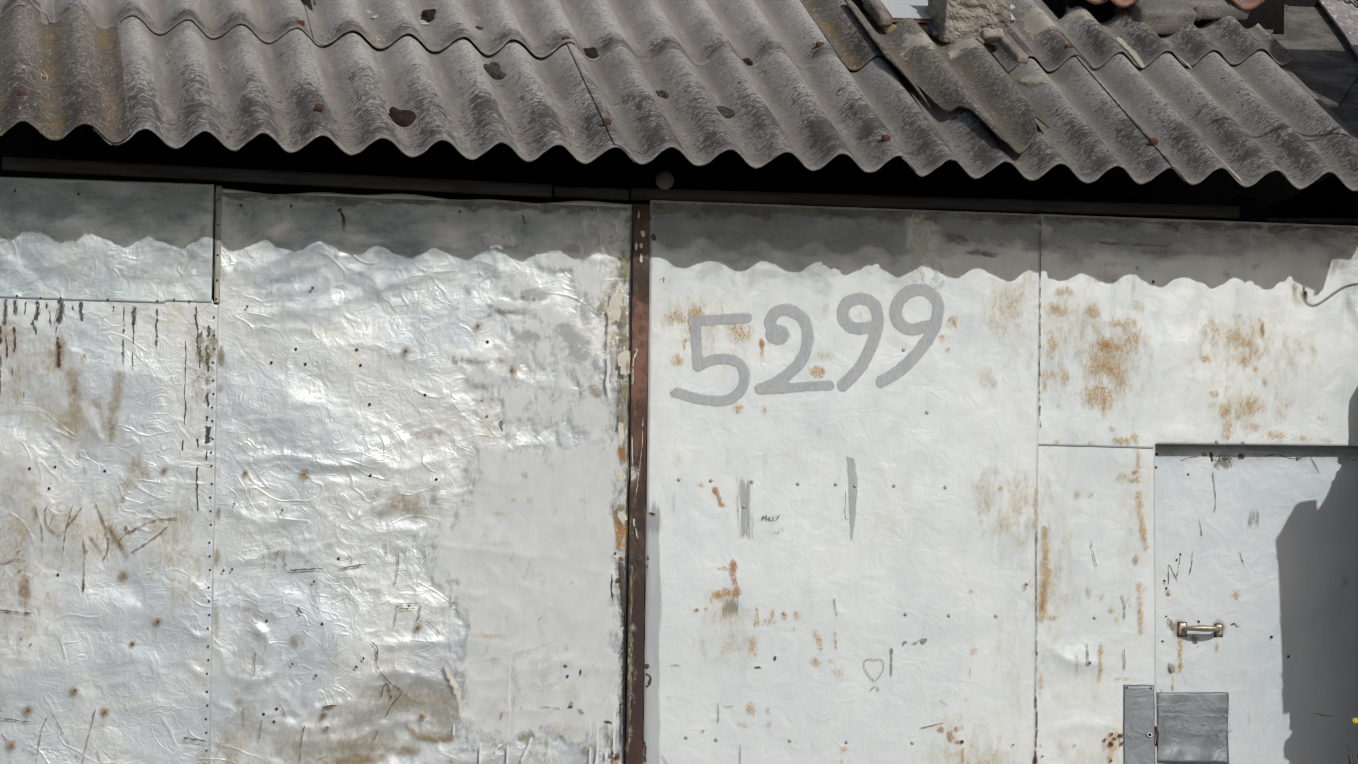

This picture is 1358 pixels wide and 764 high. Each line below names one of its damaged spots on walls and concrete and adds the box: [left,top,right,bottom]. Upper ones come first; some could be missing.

rust [0,326,16,394]
rust [56,337,80,425]
rust [1088,321,1138,412]
rust [1210,320,1266,384]
rust [1210,392,1284,440]
rust [1112,428,1148,563]
rust [706,561,739,614]
rust [1025,492,1055,620]
rust [1103,732,1123,762]